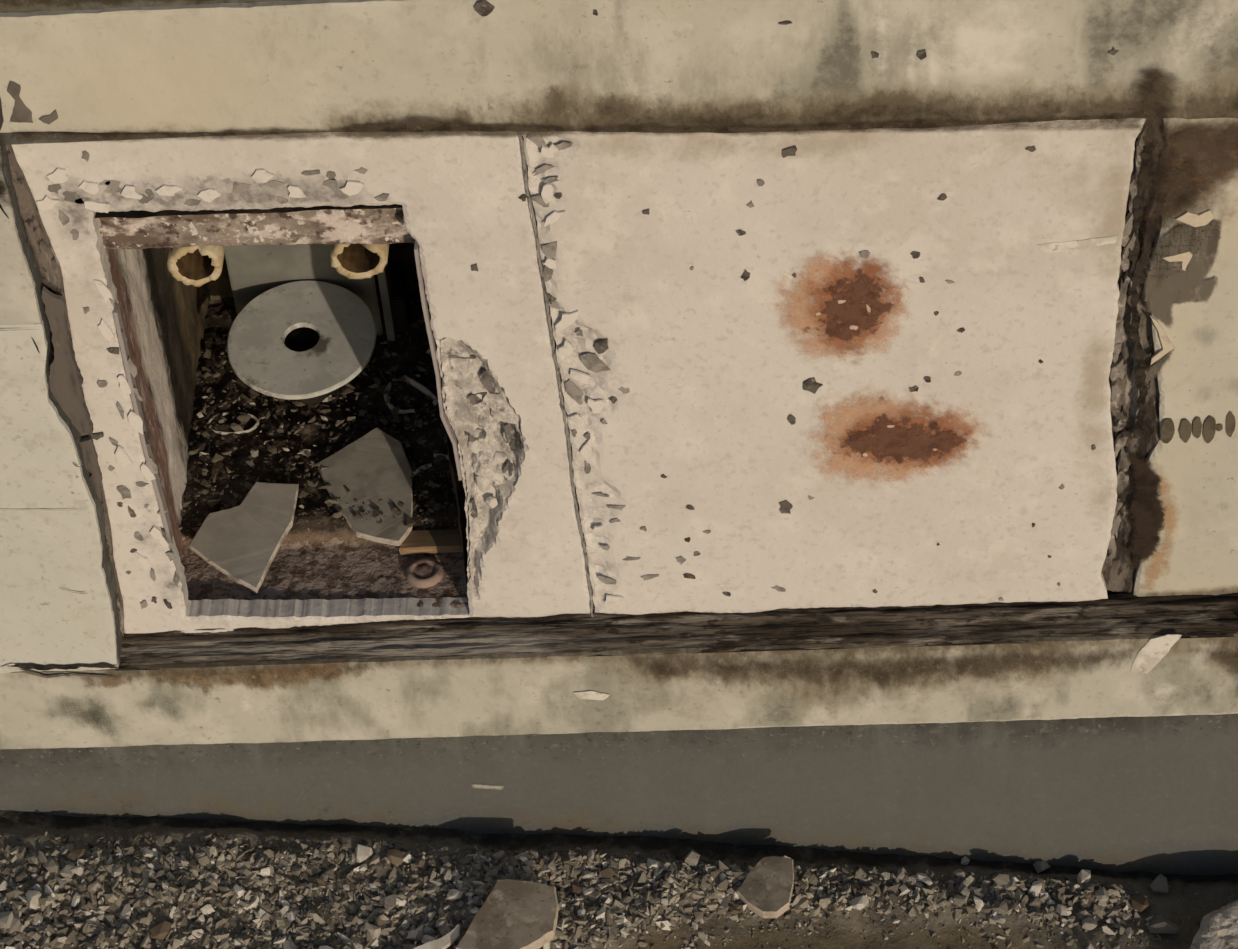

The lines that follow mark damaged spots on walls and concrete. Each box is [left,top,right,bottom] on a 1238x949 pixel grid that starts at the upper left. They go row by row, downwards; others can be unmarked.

spalling [0,81,58,130]
rust [783,258,904,356]
peeling [1145,209,1221,377]
crack [0,70,1174,678]
spalling [441,337,524,597]
rust [818,398,979,481]
leakage [651,652,1125,687]
leakage [1211,651,1238,675]